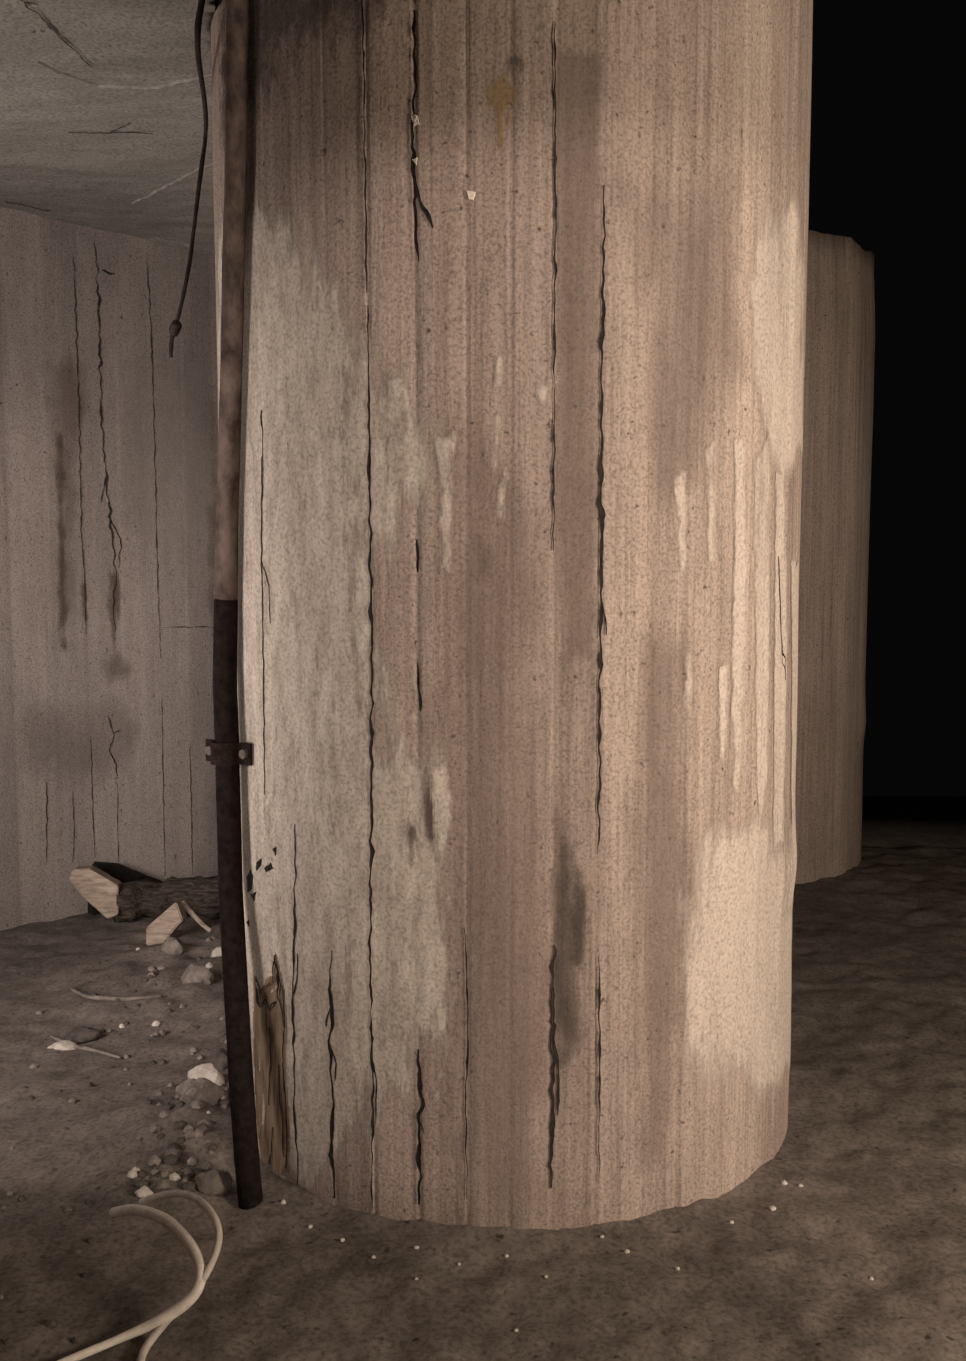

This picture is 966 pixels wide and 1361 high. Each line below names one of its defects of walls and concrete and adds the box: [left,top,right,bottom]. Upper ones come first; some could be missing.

crack [21,0,92,67]
crack [410,10,433,262]
crack [73,243,122,630]
crack [147,267,213,655]
crack [361,0,377,1211]
crack [597,185,607,854]
crack [291,824,337,1199]
crack [415,1049,425,1205]
crack [462,929,470,1196]
crack [548,945,560,1189]
damp [554,850,585,1036]
crack [595,956,603,1173]